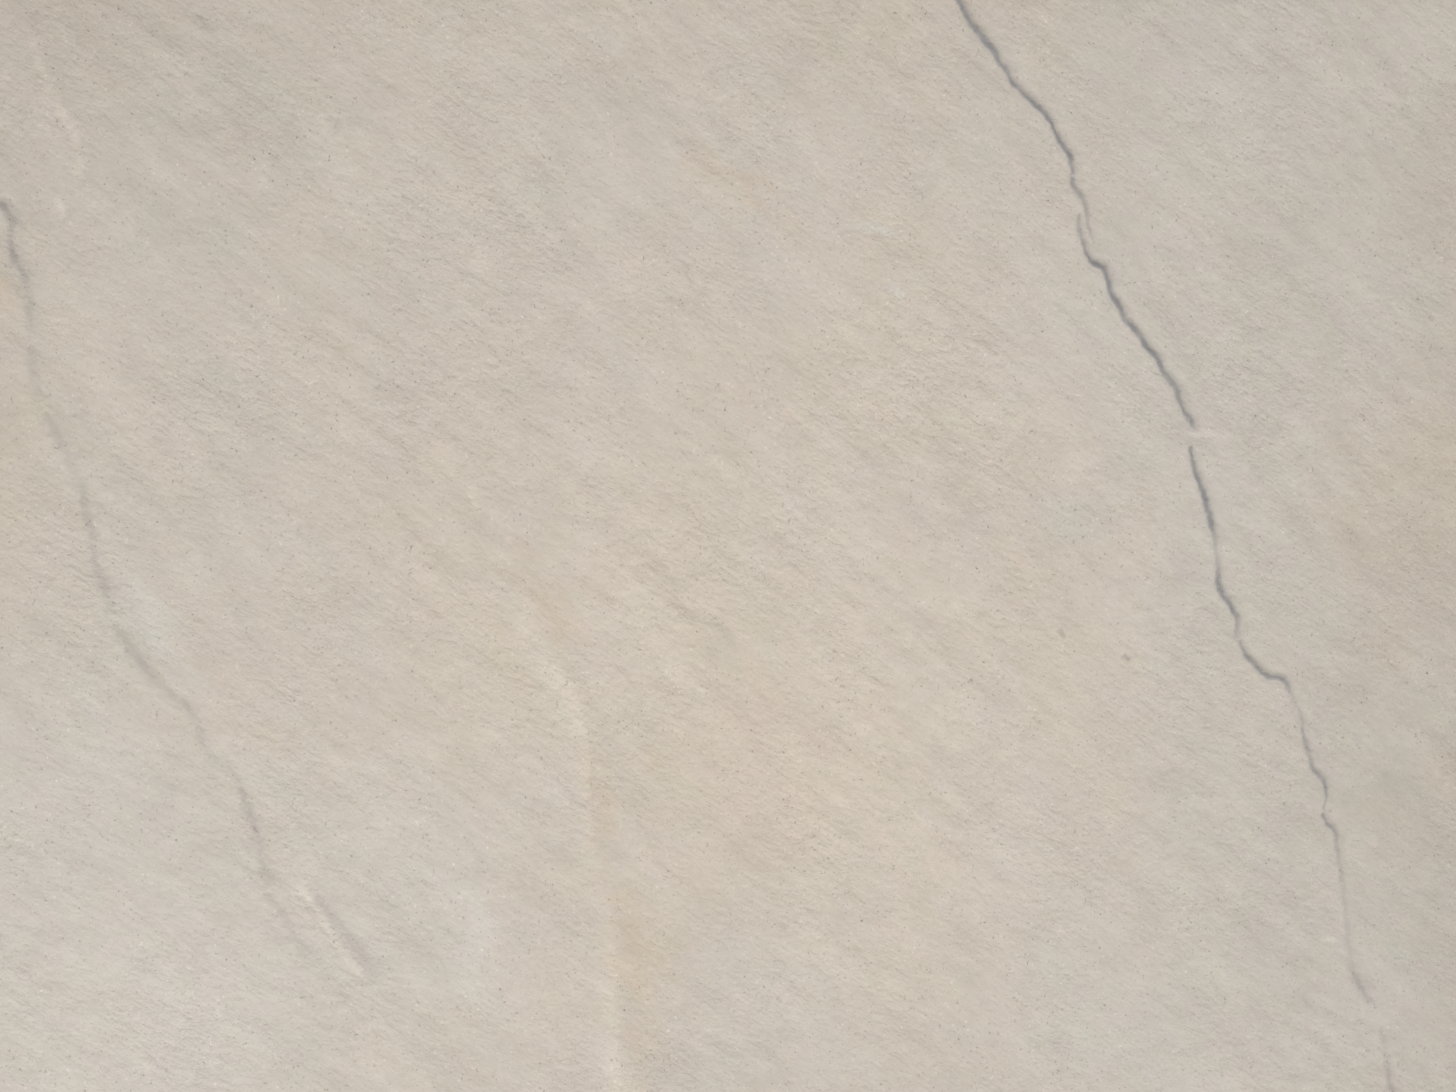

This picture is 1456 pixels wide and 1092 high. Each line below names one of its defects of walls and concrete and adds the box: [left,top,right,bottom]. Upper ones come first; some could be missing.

crack [950,0,1404,1092]